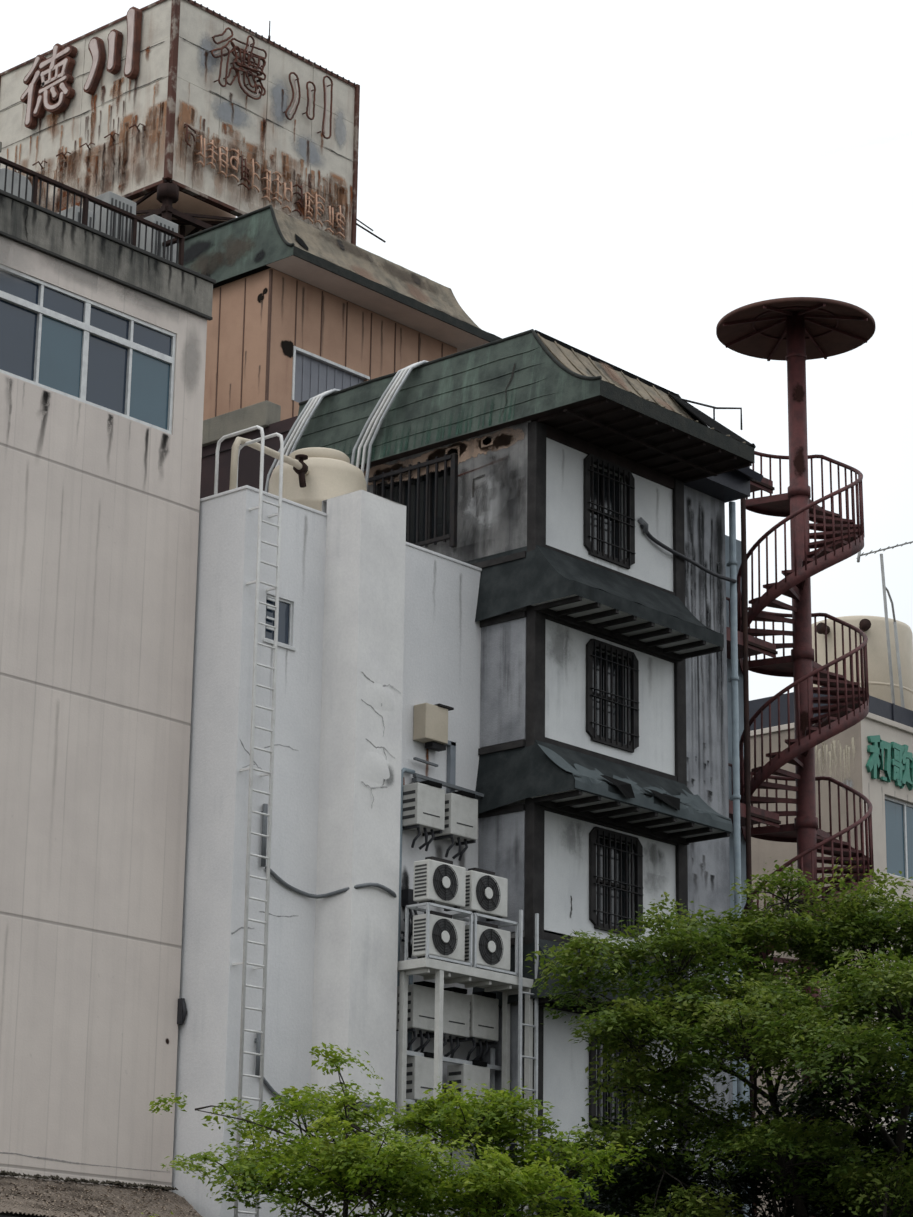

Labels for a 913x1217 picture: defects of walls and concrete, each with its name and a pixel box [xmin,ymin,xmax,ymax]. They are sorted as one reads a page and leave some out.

water stain [146,429,168,455]
spalling [364,428,525,485]
crack [362,672,386,755]